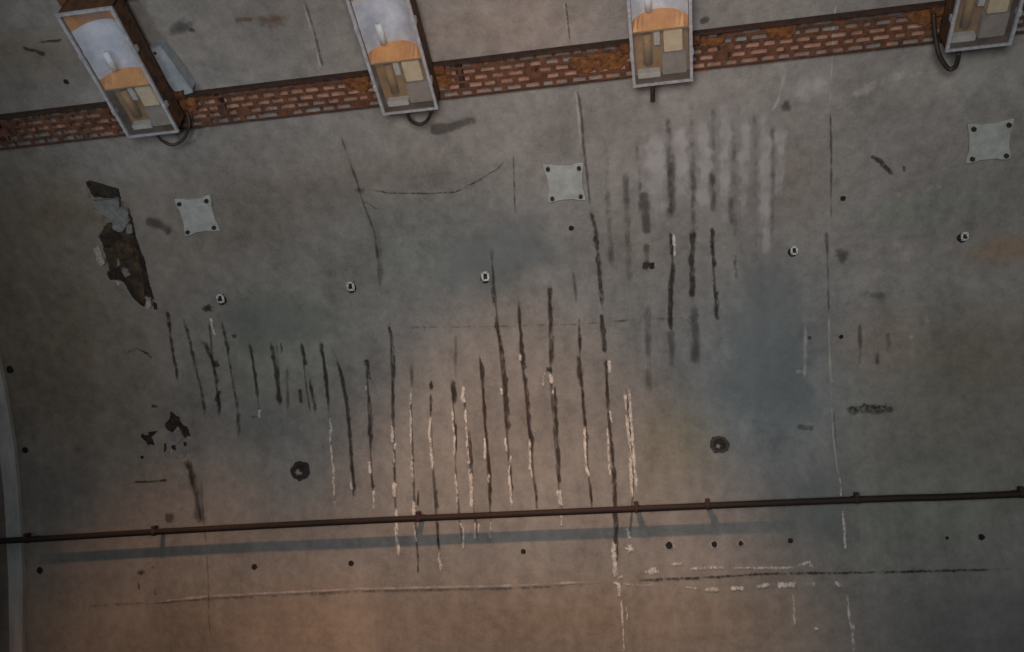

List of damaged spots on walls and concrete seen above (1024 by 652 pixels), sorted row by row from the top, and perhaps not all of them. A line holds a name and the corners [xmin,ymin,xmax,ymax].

corrosion [184,80,377,120]
corrosion [438,53,632,94]
corrosion [693,19,942,74]
spalling [86,181,158,310]
spalling [141,411,191,459]
water stain [298,343,356,490]
water stain [451,359,492,508]
water stain [495,318,513,506]
water stain [518,308,538,501]
water stain [542,288,563,525]
water stain [577,319,593,502]
water stain [600,315,634,651]